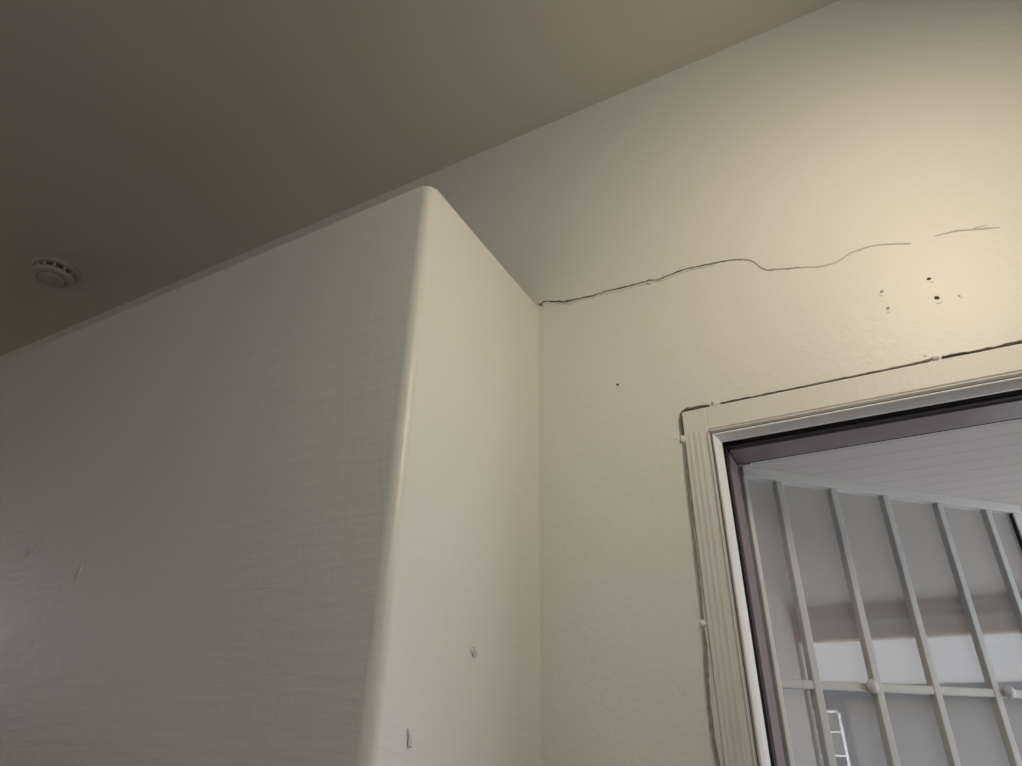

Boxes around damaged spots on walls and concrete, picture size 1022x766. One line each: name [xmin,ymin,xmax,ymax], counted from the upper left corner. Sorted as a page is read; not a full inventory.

crack [934,225,1000,236]
crack [538,242,911,306]
crack [680,340,1022,766]